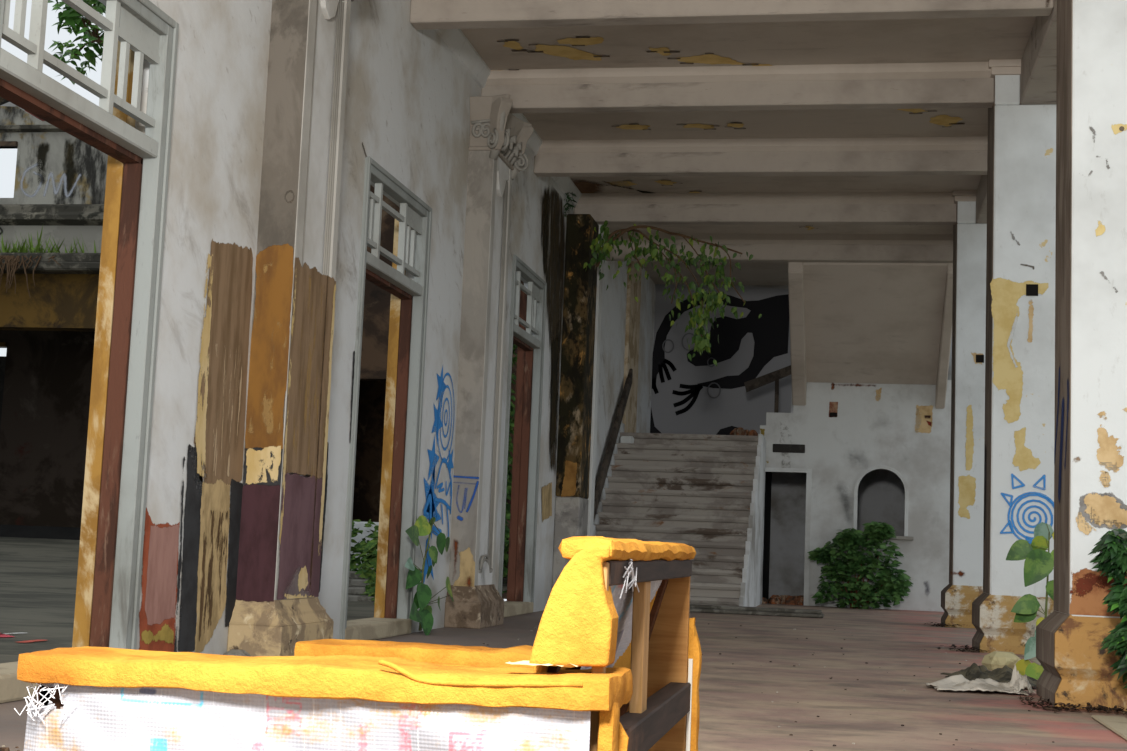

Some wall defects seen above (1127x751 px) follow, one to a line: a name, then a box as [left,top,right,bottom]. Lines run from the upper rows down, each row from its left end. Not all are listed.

peeling [497,37,610,61]
peeling [646,47,772,66]
peeling [1111,124,1127,134]
peeling [971,278,1049,471]
peeling [958,405,976,519]
peeling [1076,411,1127,535]